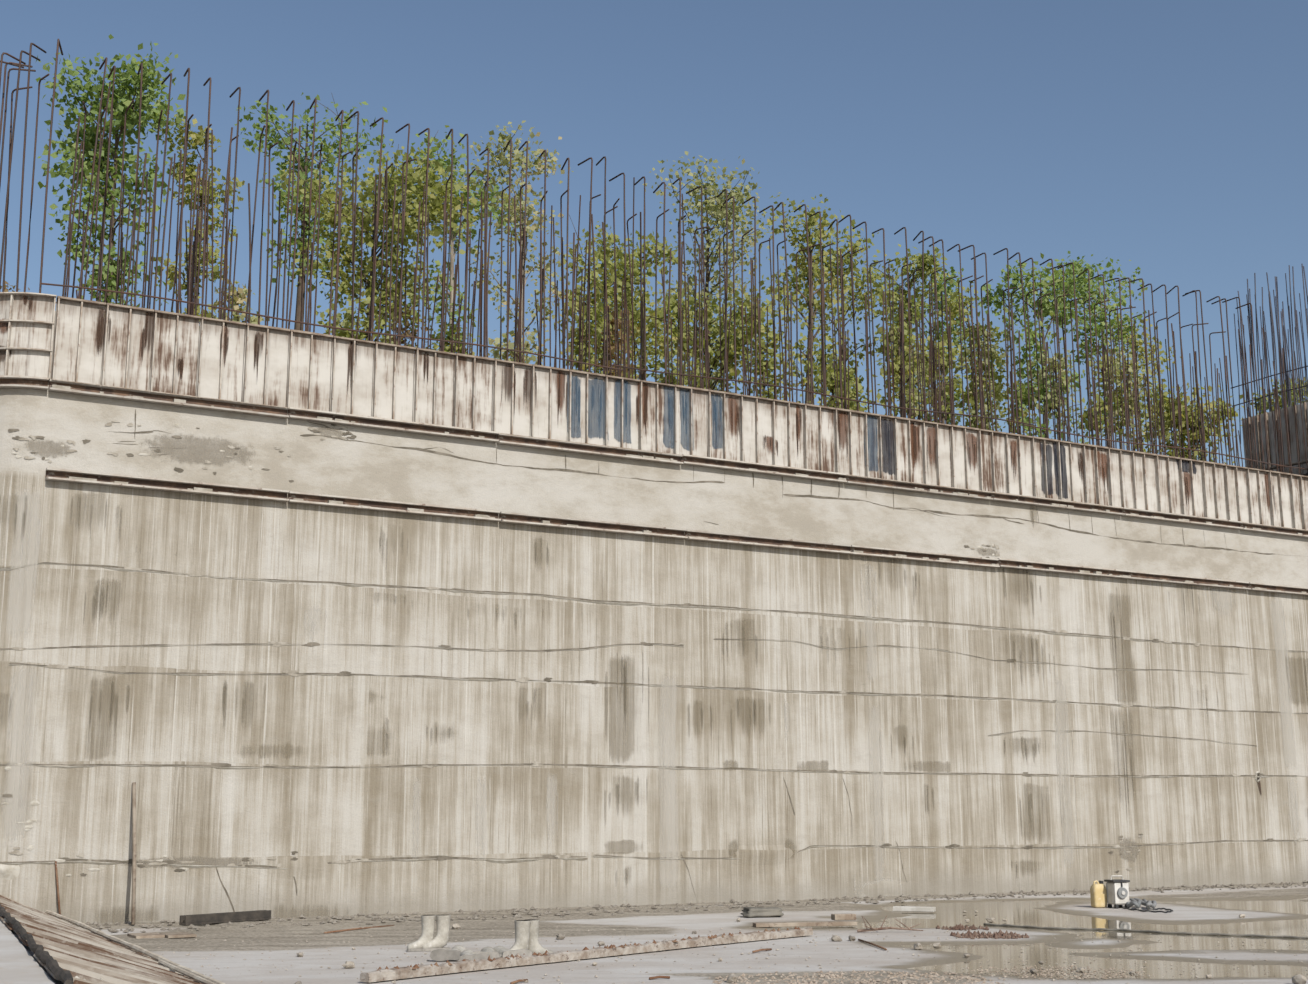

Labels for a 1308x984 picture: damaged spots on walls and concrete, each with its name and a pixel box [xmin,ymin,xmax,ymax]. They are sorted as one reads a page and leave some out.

rust [0,319,11,361]
rust [96,308,111,353]
rust [141,312,155,358]
rust [220,325,229,359]
rust [254,332,264,376]
rust [347,338,357,387]
rust [501,364,537,411]
rust [910,423,936,466]
crack [0,562,1306,674]
crack [0,641,1308,882]
crack [0,857,297,912]
crack [327,854,742,893]